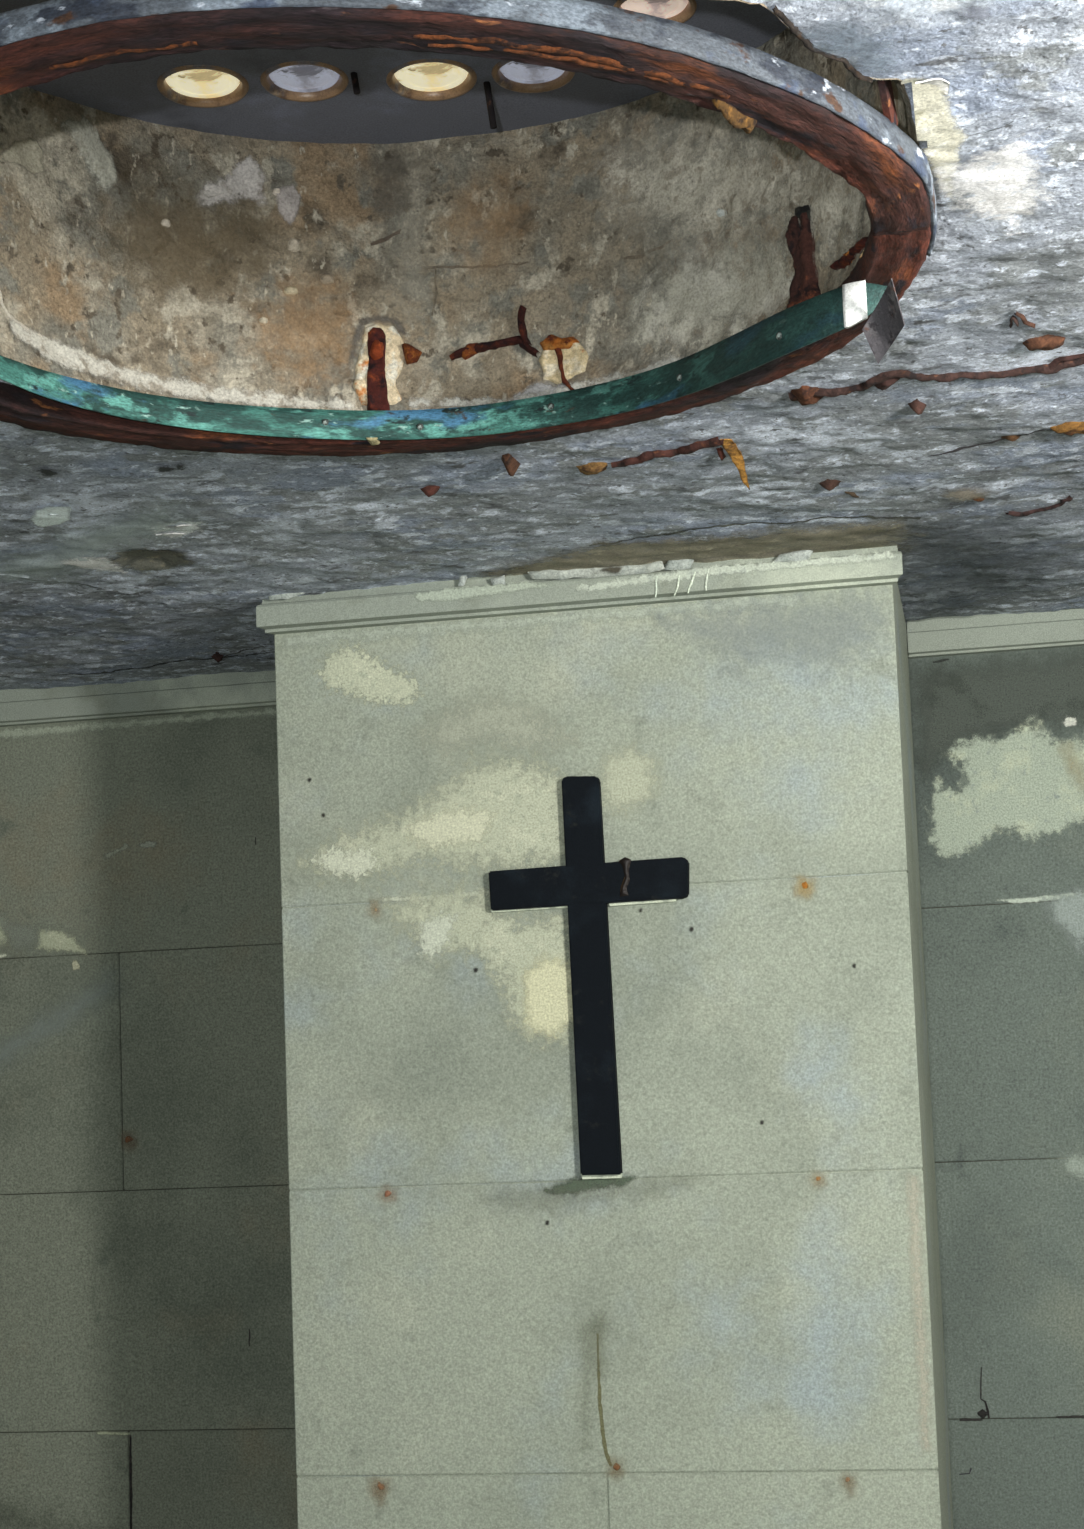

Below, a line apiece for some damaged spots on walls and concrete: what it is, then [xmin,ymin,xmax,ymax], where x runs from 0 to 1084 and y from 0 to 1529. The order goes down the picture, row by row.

peeling [0,139,45,175]
peeling [61,116,117,188]
peeling [200,157,301,224]
peeling [601,125,870,360]
spalling [351,315,422,406]
spalling [449,305,589,400]
rust [1022,334,1065,351]
rust [908,399,926,415]
water stain [917,654,1084,773]